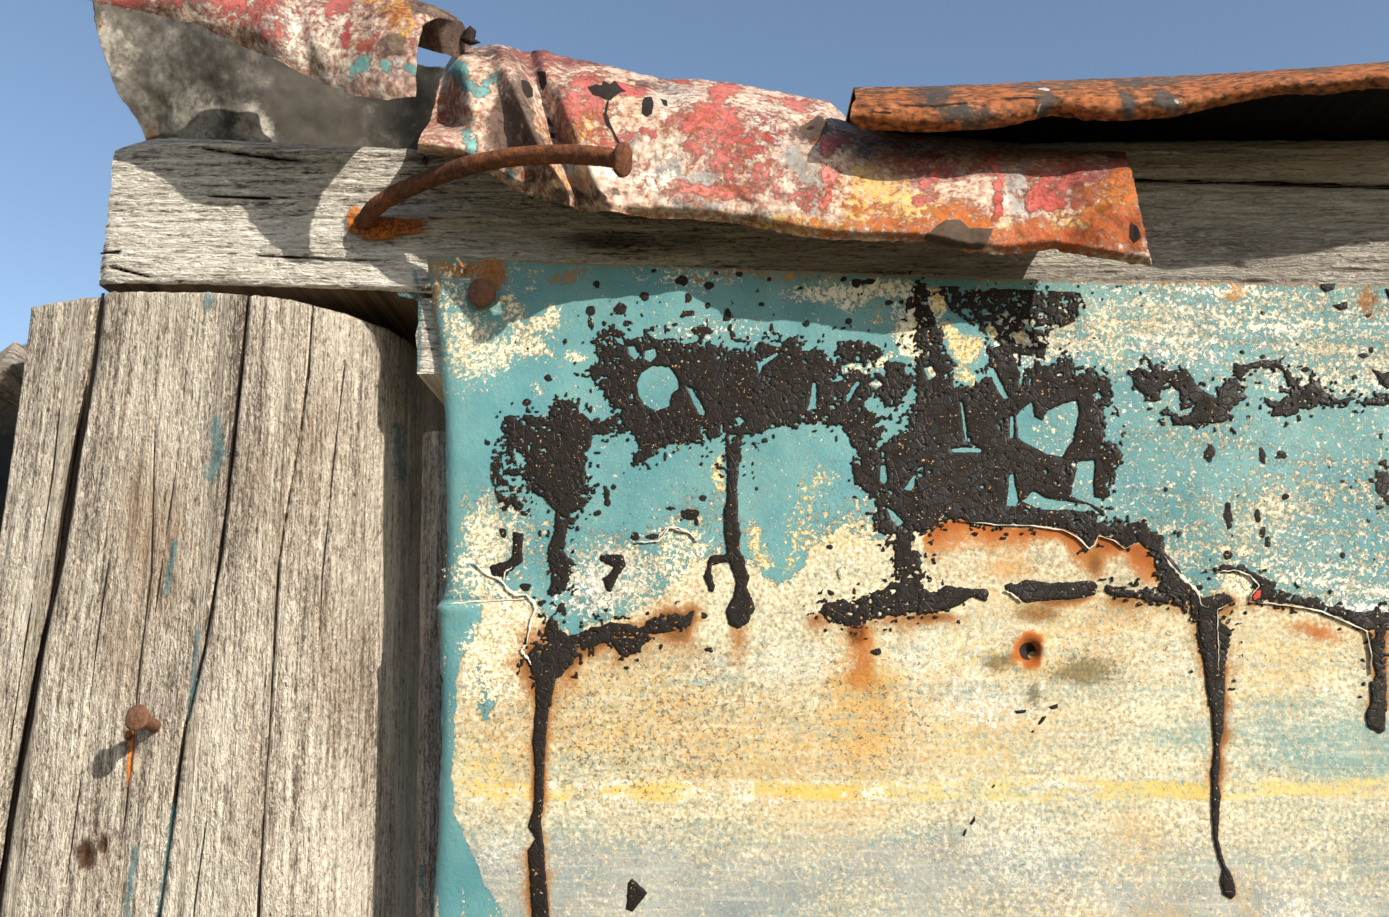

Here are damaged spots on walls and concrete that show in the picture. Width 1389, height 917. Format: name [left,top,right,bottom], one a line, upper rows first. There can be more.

corrosion [347,206,426,240]
peeling [425,262,588,381]
peeling [844,287,1025,388]
crack [157,296,249,917]
crack [257,305,346,917]
peeling [438,504,542,712]
peeling [637,521,723,608]
corrosion [923,519,1159,610]
corrosion [1011,596,1091,670]
peeling [1165,557,1372,668]
corrosion [124,730,141,778]
corrosion [510,603,702,817]